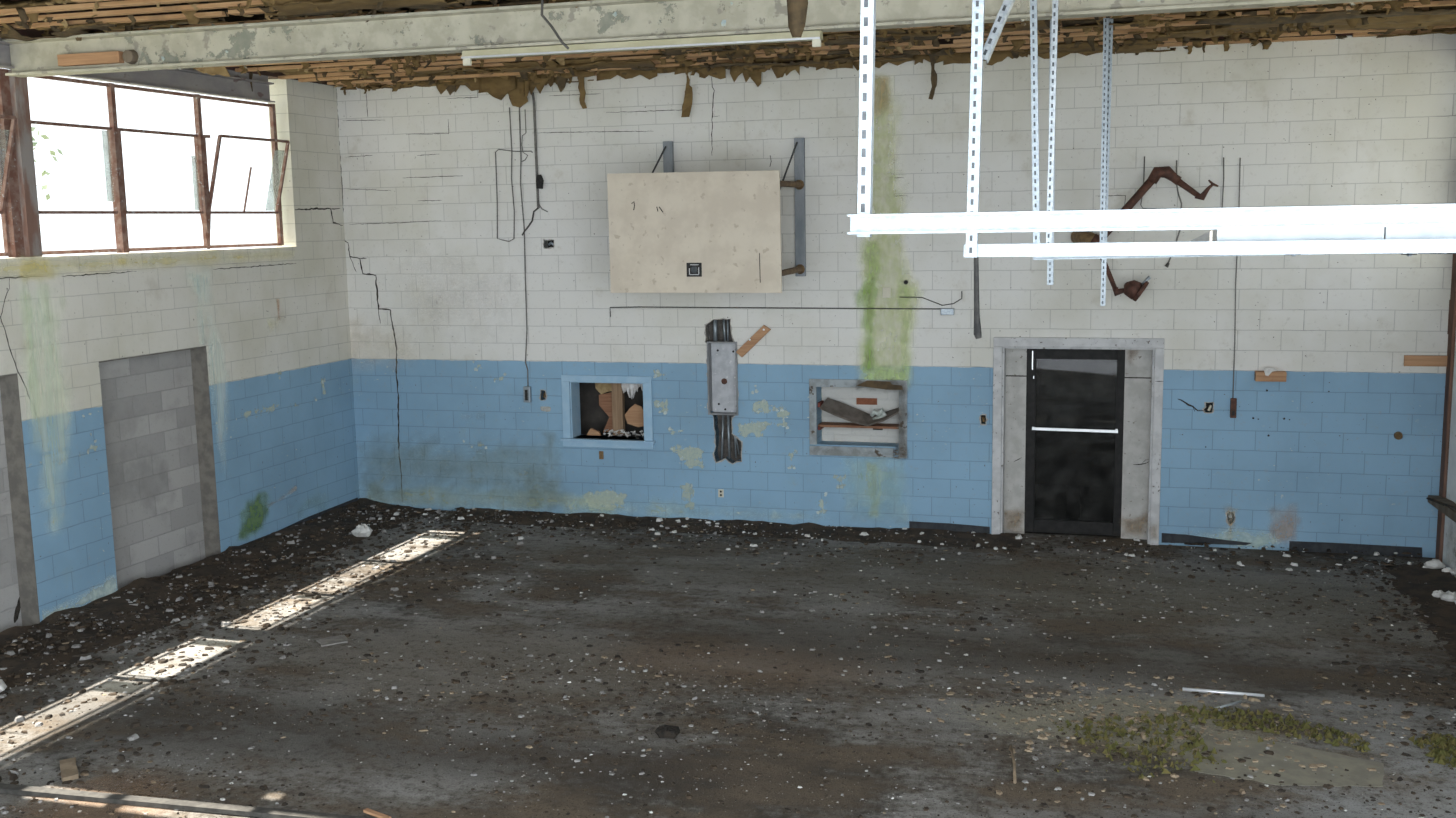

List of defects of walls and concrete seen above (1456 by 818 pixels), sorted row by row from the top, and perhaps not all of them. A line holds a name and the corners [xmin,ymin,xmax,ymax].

peeling [125,20,296,70]
peeling [596,6,629,34]
crack [295,89,478,502]
spalling [704,318,738,375]
spalling [654,385,790,509]